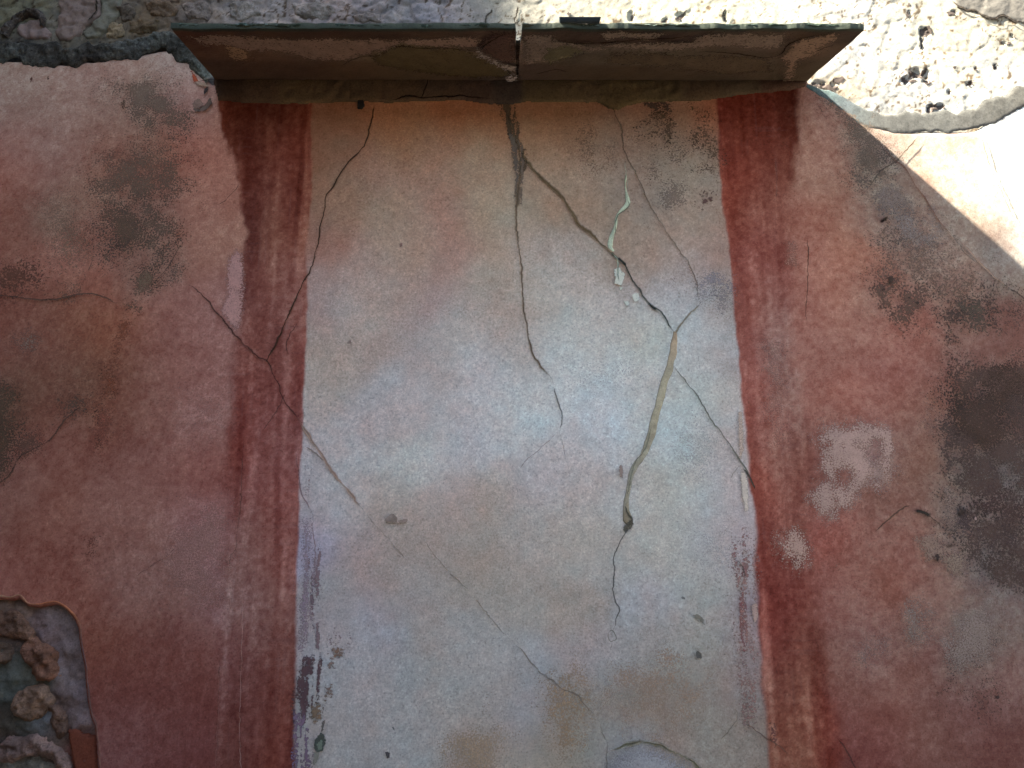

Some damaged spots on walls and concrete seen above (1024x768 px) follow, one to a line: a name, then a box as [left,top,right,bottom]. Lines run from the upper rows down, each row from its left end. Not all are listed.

water stain [0,67,211,313]
crack [195,80,481,564]
crack [508,111,699,466]
crack [677,371,755,488]
mould [812,88,1024,604]
spalling [0,594,101,768]
crack [427,529,700,768]